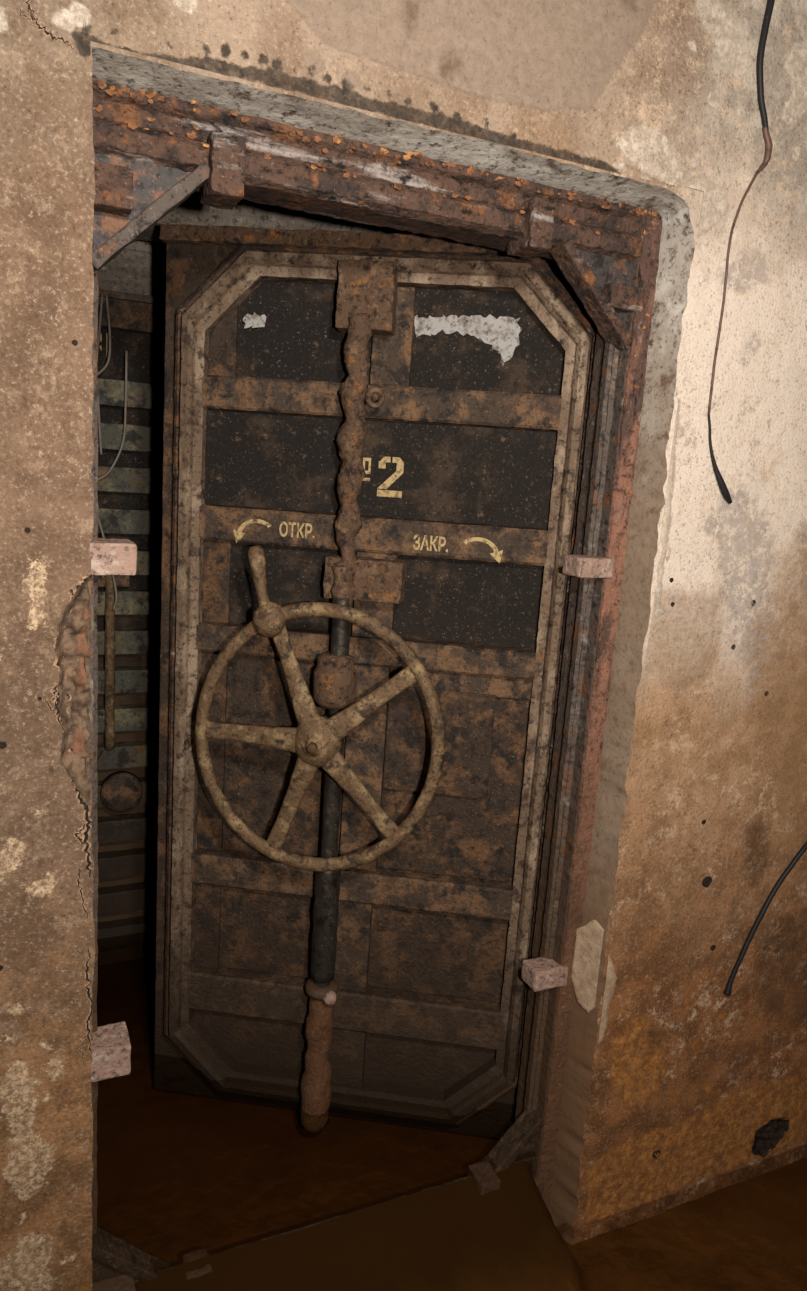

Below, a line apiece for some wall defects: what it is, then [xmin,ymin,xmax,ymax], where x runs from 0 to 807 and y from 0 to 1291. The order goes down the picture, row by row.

spalling [38,572,92,806]
water stain [0,838,26,882]
water stain [23,872,57,897]
spalling [752,1119,790,1158]
water stain [0,1037,77,1291]